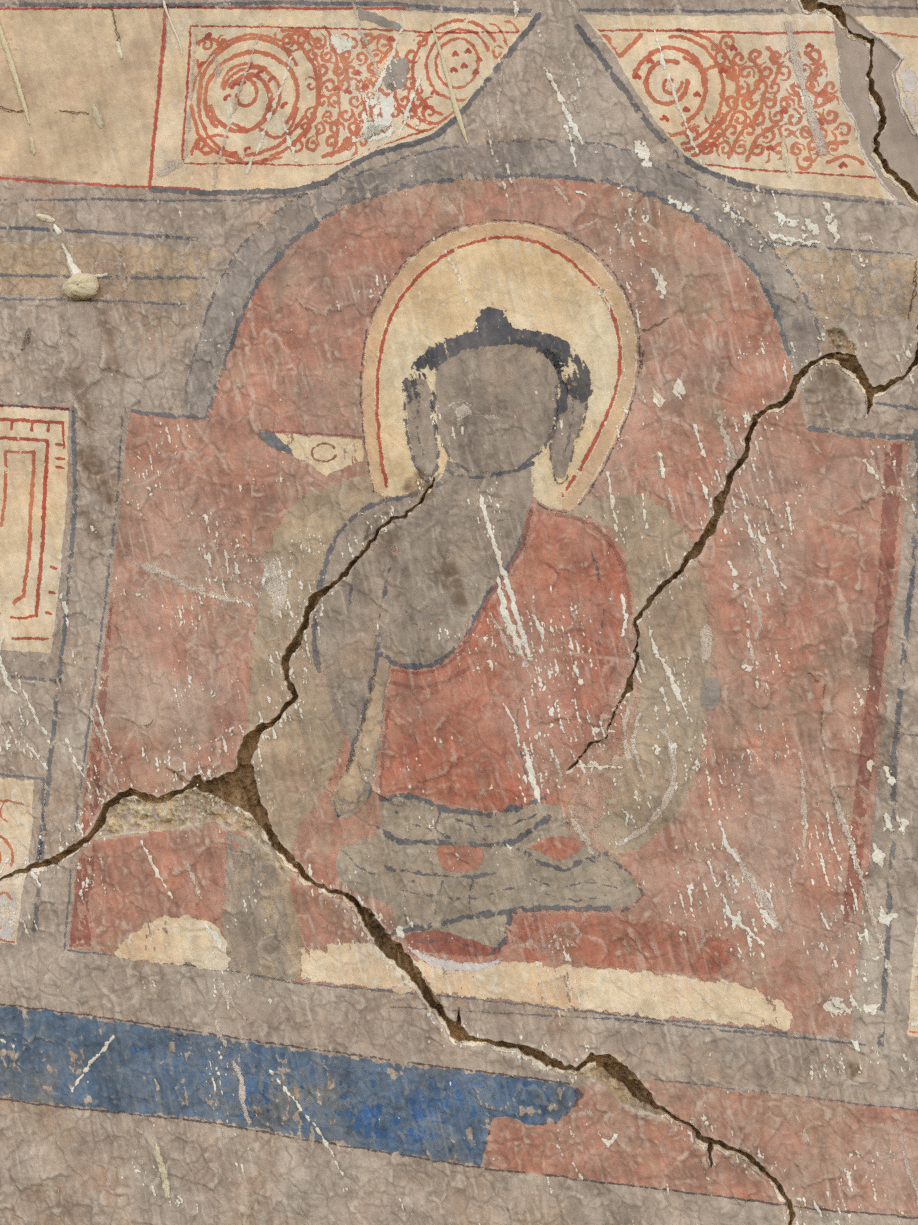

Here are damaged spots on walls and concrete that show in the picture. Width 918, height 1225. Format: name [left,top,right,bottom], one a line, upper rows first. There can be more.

crack [798,0,918,207]
peeling [634,140,652,167]
peeling [668,195,699,212]
peeling [768,202,840,247]
crack [557,261,918,800]
spalling [94,788,292,882]
crack [0,478,796,1225]